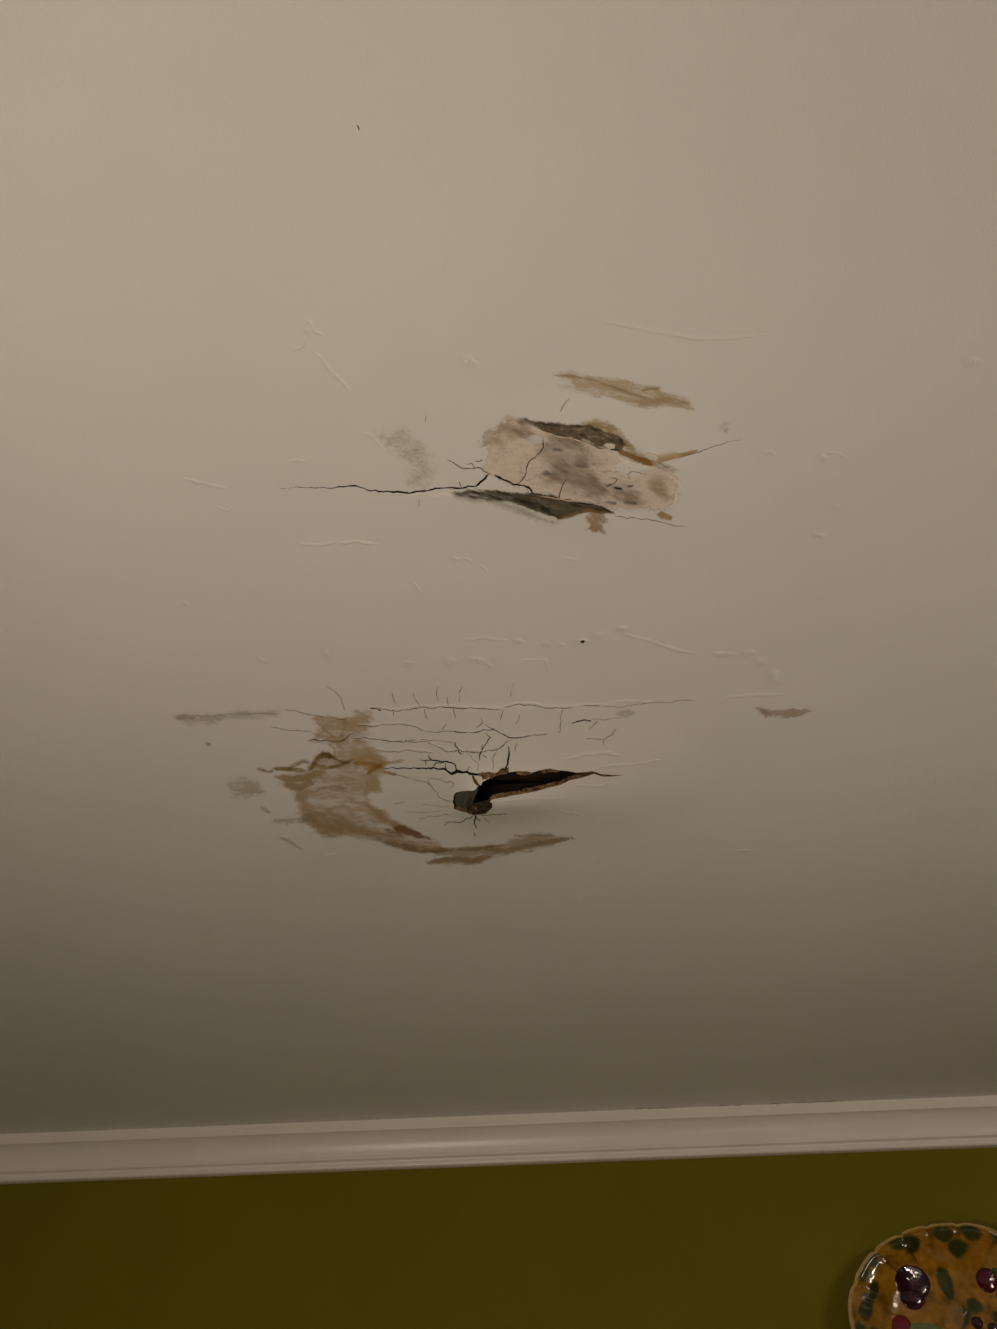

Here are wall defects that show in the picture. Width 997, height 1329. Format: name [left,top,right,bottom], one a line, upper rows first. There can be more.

crack [280,474,488,497]
spalling [450,419,696,520]
leakage [234,716,567,864]
crack [196,682,691,835]